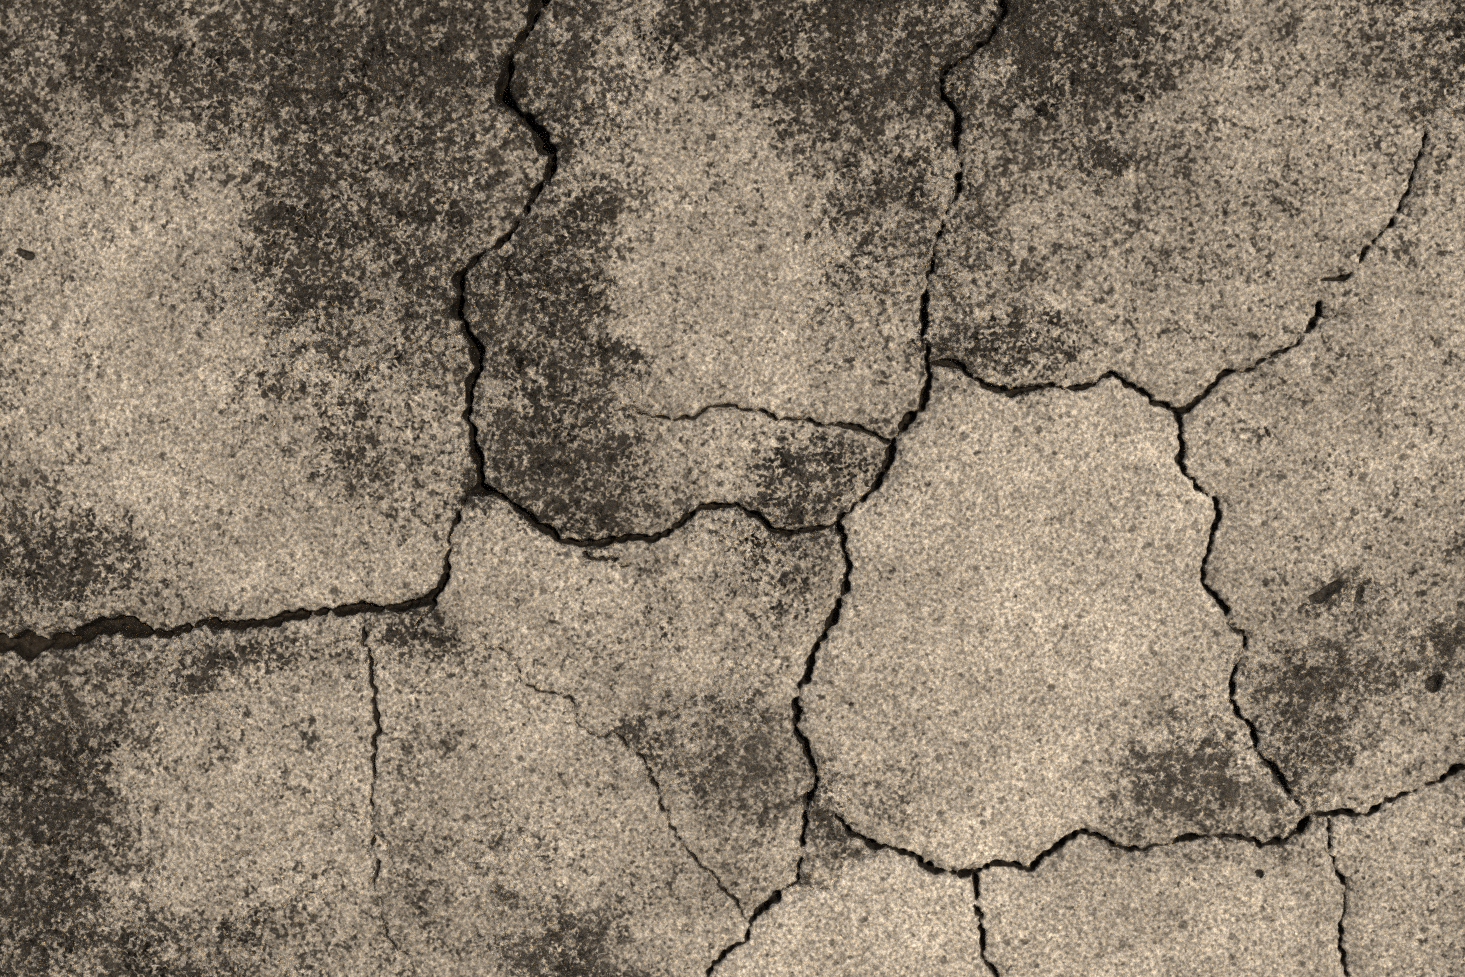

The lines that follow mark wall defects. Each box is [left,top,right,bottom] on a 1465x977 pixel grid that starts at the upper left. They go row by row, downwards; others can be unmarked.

crack [1321,127,1427,281]
crack [0,0,1345,847]
crack [371,835,382,900]
crack [636,752,803,977]
crack [834,764,1465,977]